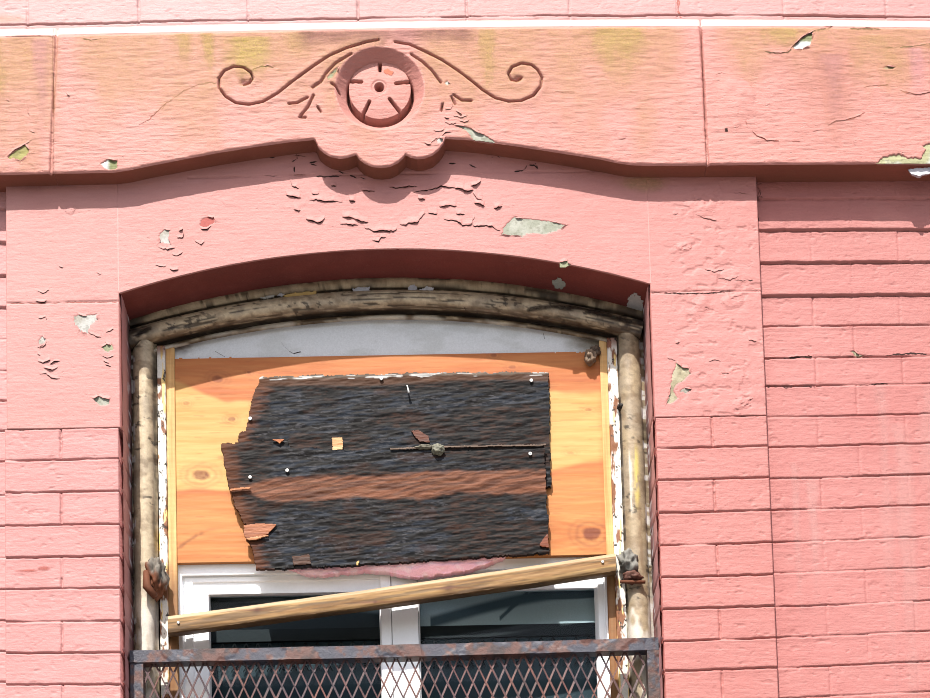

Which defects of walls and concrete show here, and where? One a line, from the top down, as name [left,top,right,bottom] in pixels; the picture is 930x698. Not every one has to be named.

crack [764,26,930,54]
spalling [7,128,35,163]
spalling [101,157,118,170]
spalling [876,144,930,178]
peeling [286,176,570,242]
peeling [155,214,218,271]
peeling [37,334,61,379]
peeling [73,311,115,367]
crack [764,352,812,360]
peeling [665,354,692,406]
peeling [91,392,112,406]